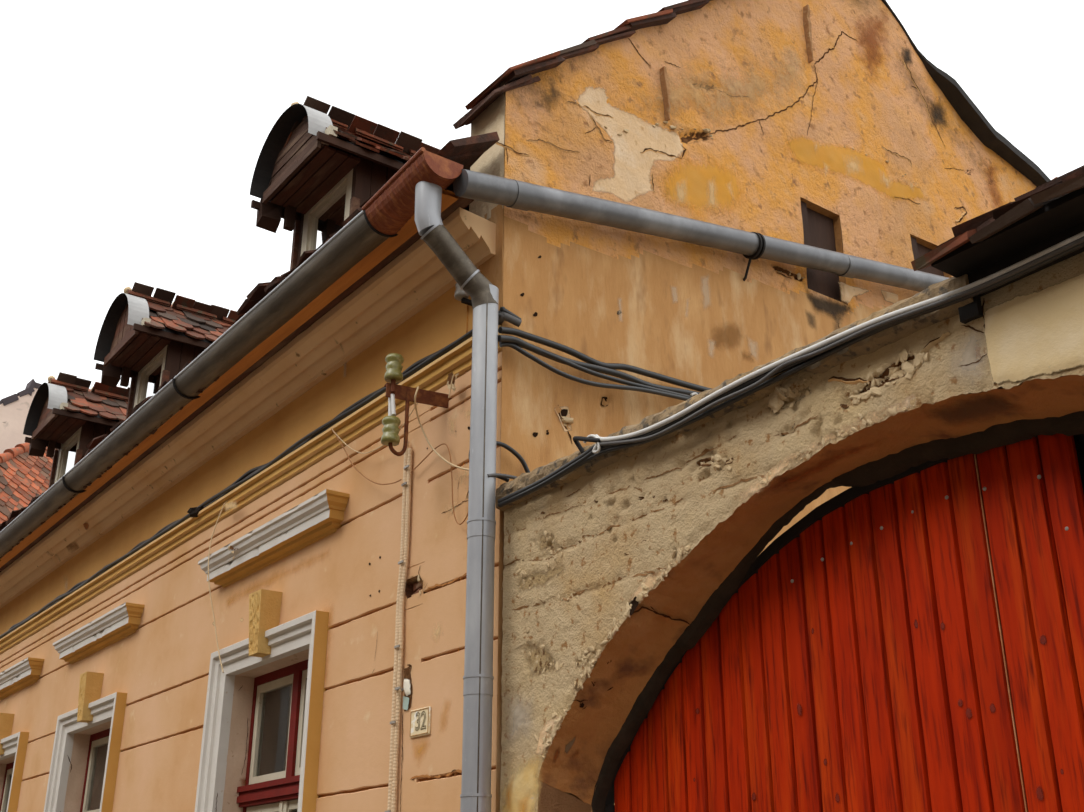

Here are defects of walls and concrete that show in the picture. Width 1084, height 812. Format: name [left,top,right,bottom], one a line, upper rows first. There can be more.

crack [711,31,858,135]
spalling [575,87,713,202]
spalling [696,454,733,473]
spalling [743,349,929,500]
crack [512,567,666,610]
crack [633,606,690,625]